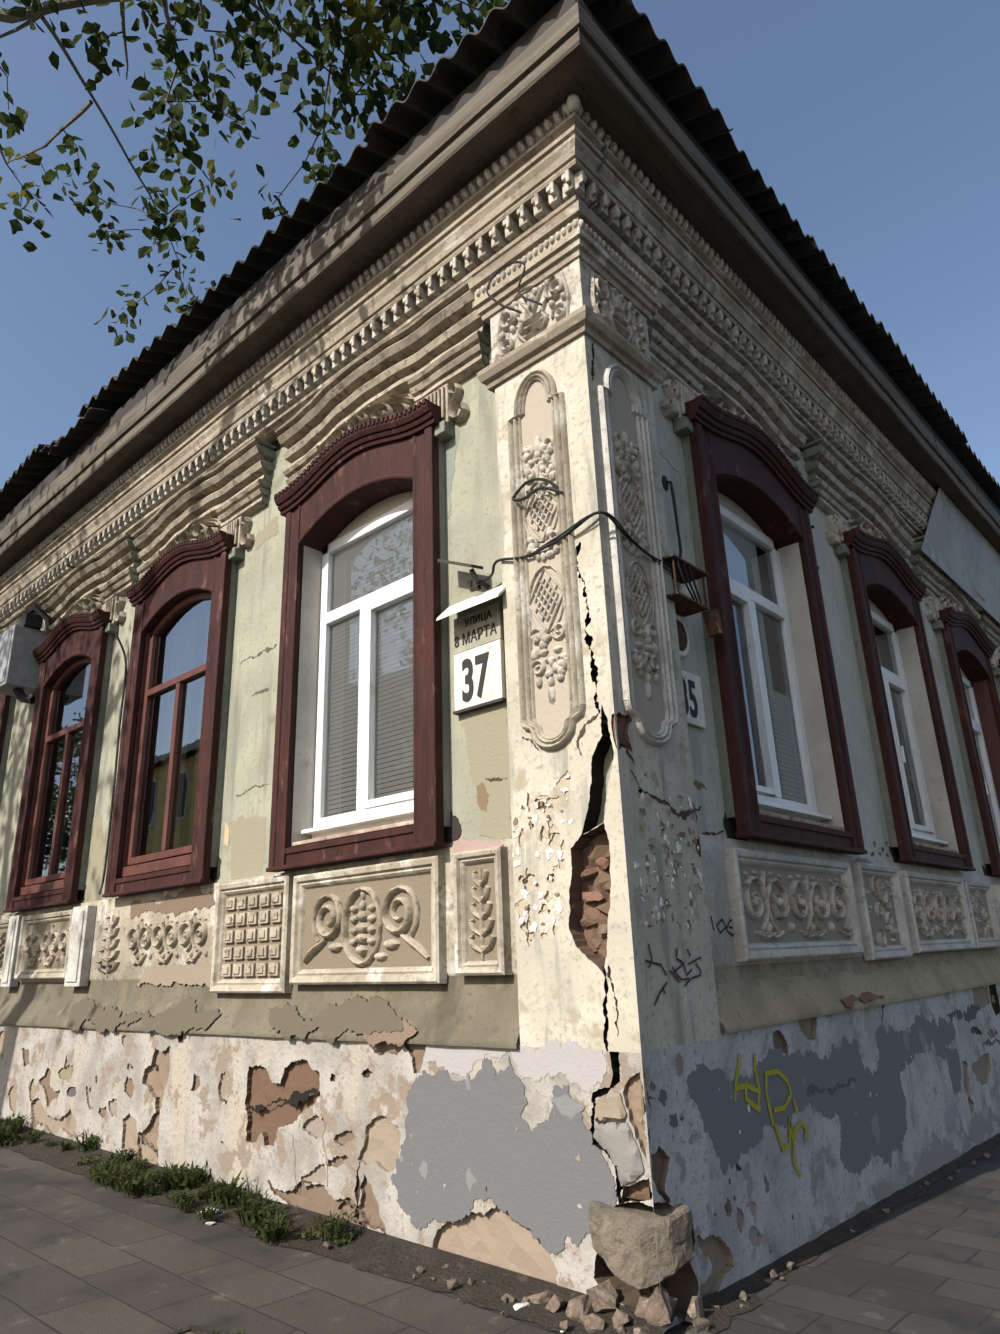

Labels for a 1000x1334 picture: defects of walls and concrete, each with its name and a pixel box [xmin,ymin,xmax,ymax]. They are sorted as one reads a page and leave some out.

crack [590,965,653,1204]